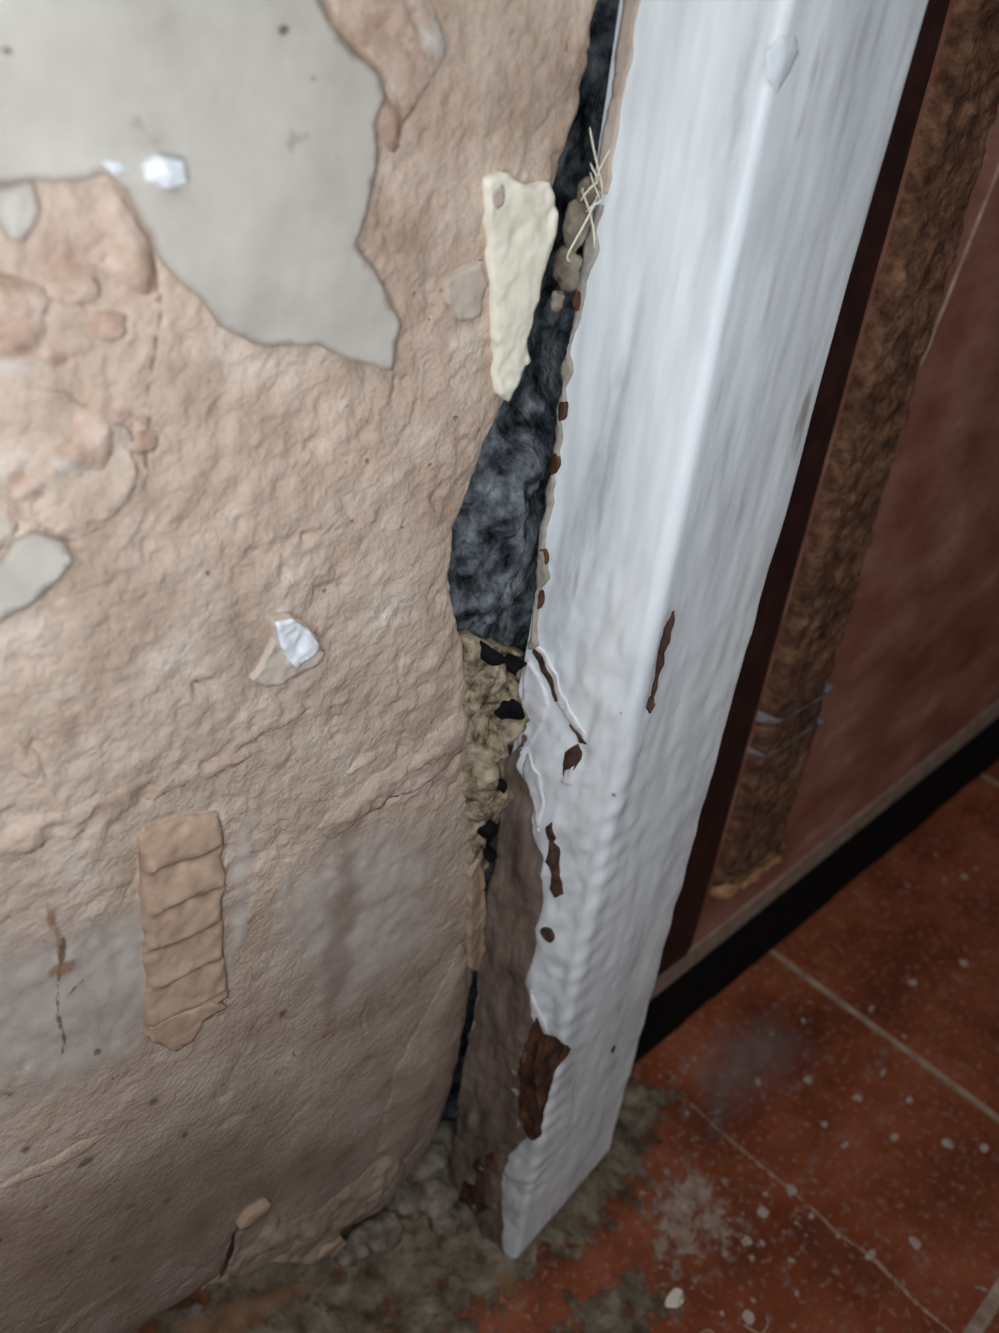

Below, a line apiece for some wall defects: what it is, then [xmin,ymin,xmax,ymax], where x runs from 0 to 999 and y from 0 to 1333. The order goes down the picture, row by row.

peeling [0,0,447,621]
peeling [442,0,641,1255]